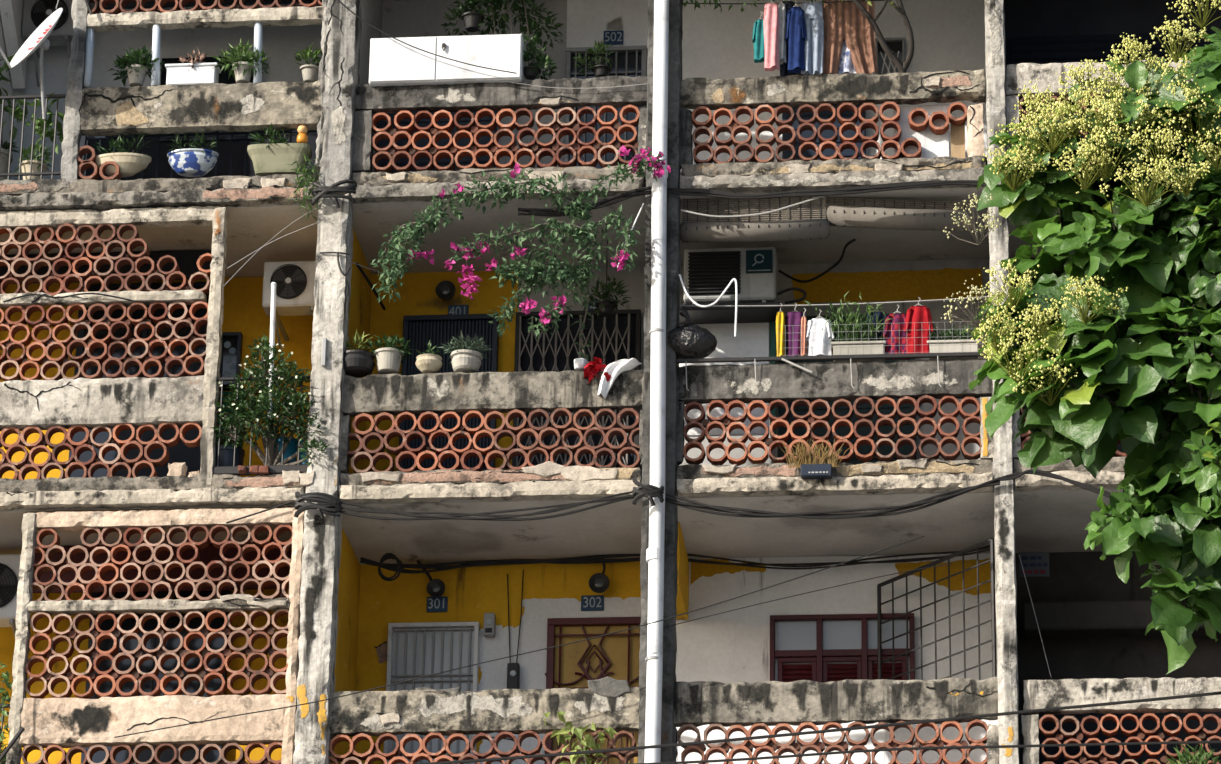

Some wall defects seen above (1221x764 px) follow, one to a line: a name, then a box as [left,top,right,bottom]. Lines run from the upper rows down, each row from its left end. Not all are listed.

crack [322,0,344,110]
water stain [177,91,261,123]
water stain [287,82,322,110]
water stain [304,515,326,663]
water stain [680,685,699,709]
water stain [723,683,775,712]
water stain [790,683,865,716]
water stain [892,680,948,704]
water stain [52,704,111,736]